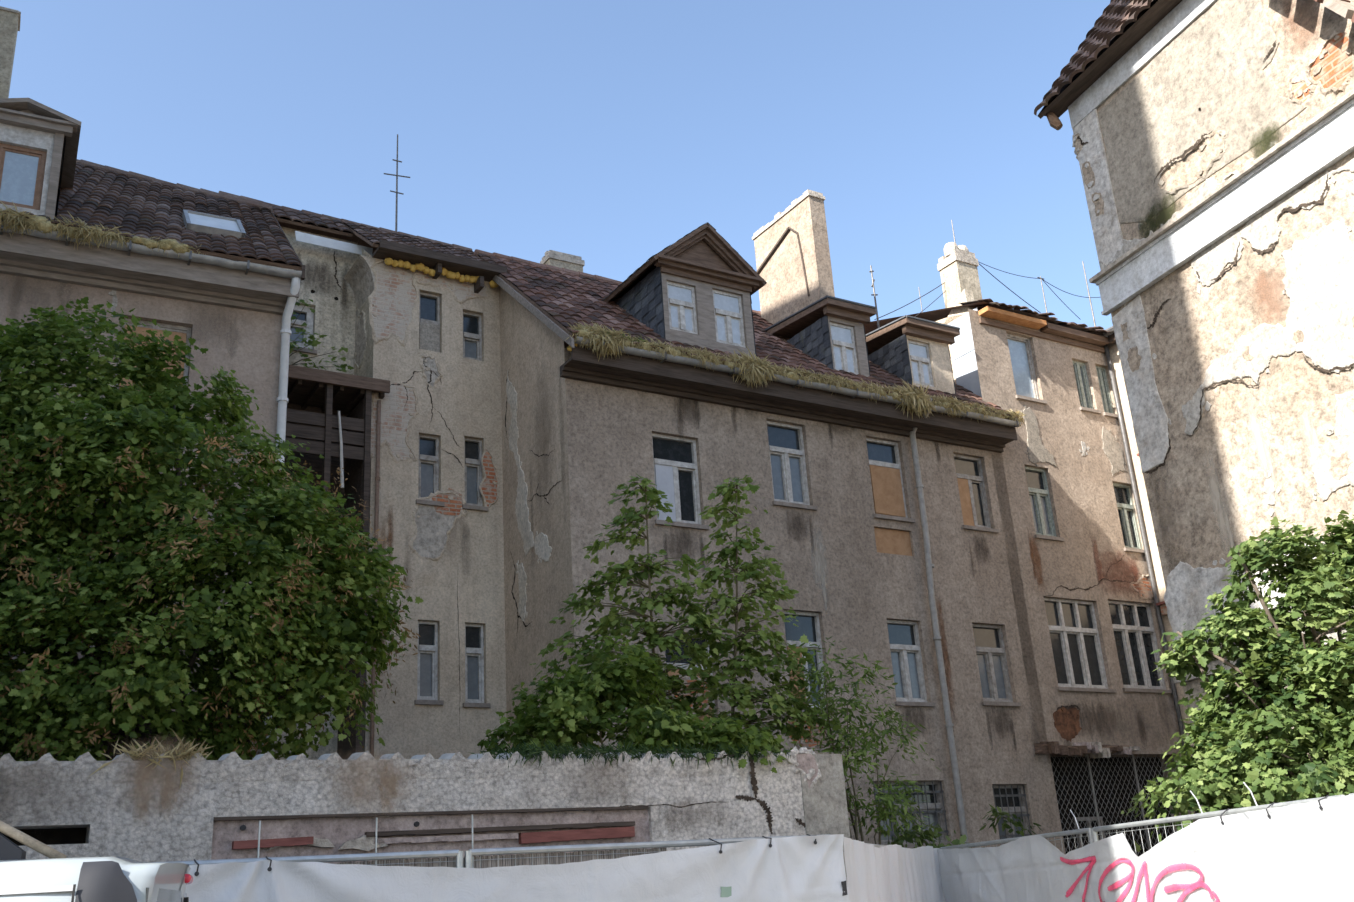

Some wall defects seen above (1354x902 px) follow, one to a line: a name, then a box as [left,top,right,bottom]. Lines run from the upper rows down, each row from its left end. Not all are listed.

flaking render [1072,0,1354,270]
flaking render [353,259,489,369]
flaking render [1111,158,1354,473]
flaking render [371,354,443,464]
crack [390,357,463,467]
spalling [408,488,468,561]
flaking render [479,448,499,508]
flaking render [506,371,553,621]
flaking render [1309,389,1354,501]
peeling [1130,554,1289,653]
spalling [1053,705,1082,742]
crack [625,753,805,834]